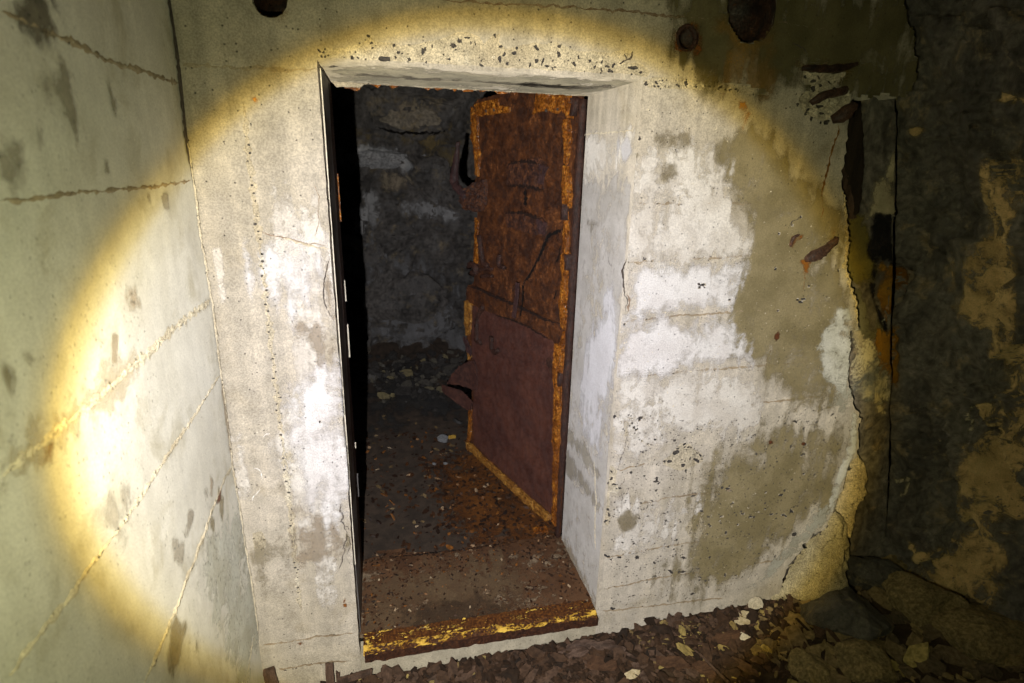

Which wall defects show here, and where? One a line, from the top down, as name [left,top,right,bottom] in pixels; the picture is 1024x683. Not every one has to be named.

spalling [796,62,859,125]
spalling [804,192,858,323]
damp [562,124,923,603]
damp [908,158,1024,605]
spalling [834,452,868,538]